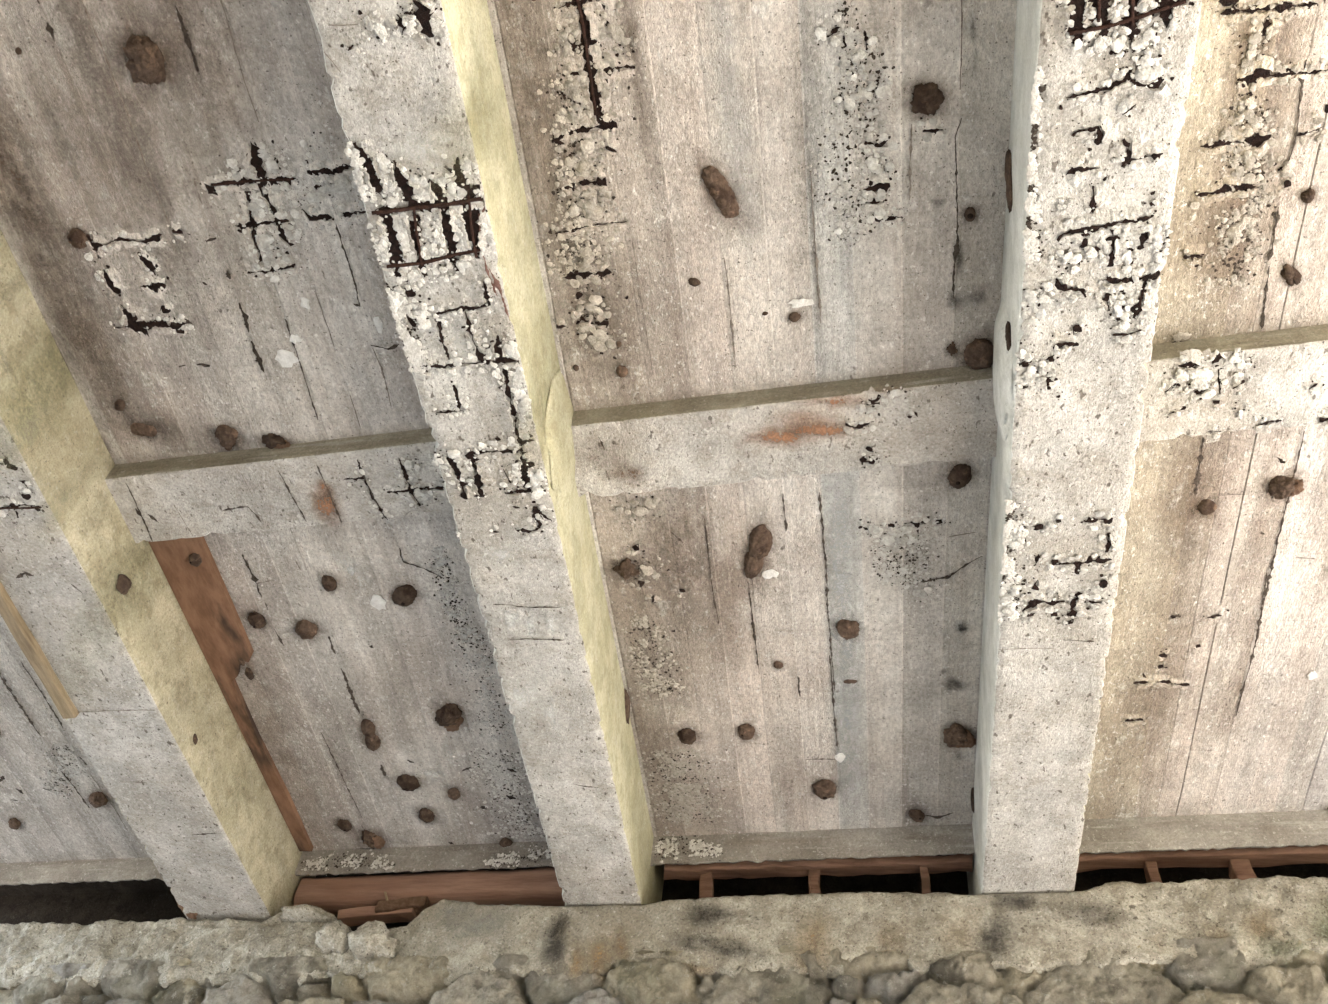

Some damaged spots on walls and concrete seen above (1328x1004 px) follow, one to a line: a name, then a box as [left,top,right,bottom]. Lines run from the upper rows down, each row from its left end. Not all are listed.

spalling [537,0,646,359]
spalling [809,1,910,247]
spalling [915,113,946,144]
spalling [1014,0,1328,398]
spalling [0,427,48,520]
spalling [197,132,555,541]
corrosion [758,415,845,445]
spalling [1158,332,1283,443]
spalling [1304,378,1328,431]
spalling [999,503,1122,629]